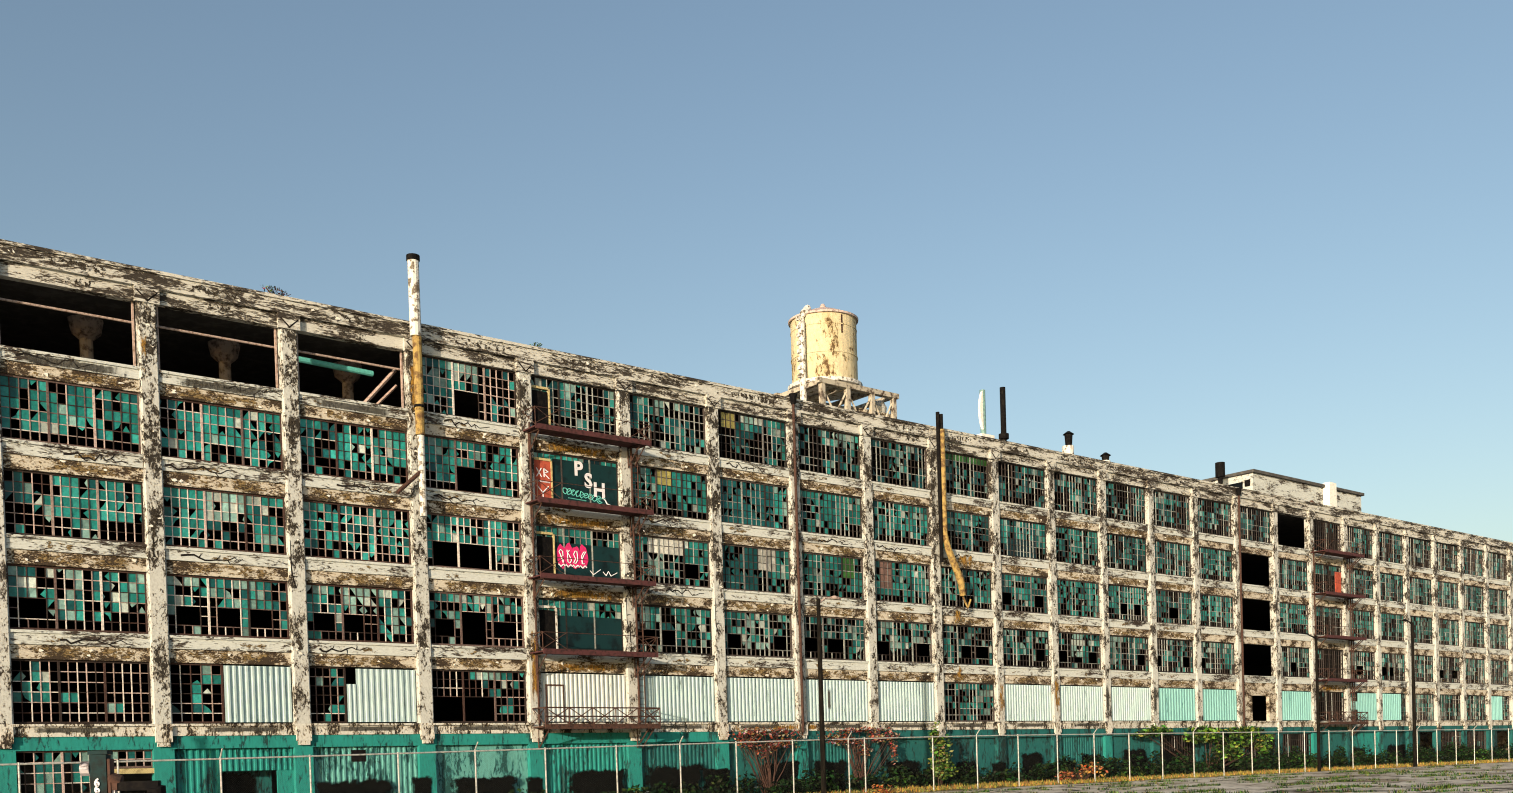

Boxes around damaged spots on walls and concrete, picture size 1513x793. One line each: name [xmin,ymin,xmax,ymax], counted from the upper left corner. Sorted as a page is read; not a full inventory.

peeling [8,249,106,288]
peeling [181,285,247,315]
spalling [143,311,155,365]
peeling [311,309,378,338]
peeling [445,338,505,363]
peeling [547,358,599,377]
peeling [731,390,779,411]
peeling [288,397,396,461]
peeling [310,486,396,505]
spalling [149,500,162,555]
peeling [25,540,136,568]
peeling [957,508,1056,608]